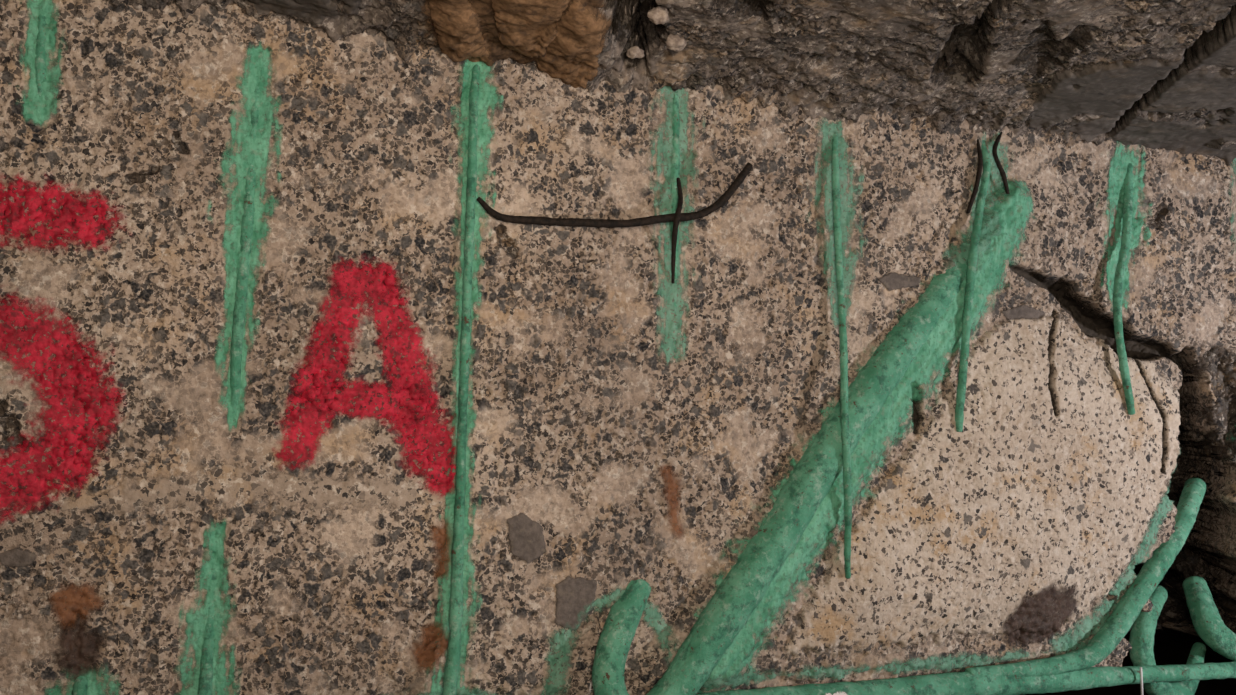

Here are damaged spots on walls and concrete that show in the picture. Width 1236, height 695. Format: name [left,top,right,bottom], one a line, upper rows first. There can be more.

spalling [1147,202,1169,230]
flaking render [879,272,921,291]
flaking render [1002,305,1045,319]
spalling [911,387,920,434]
spalling [1166,339,1236,508]
spalling [1156,497,1236,632]